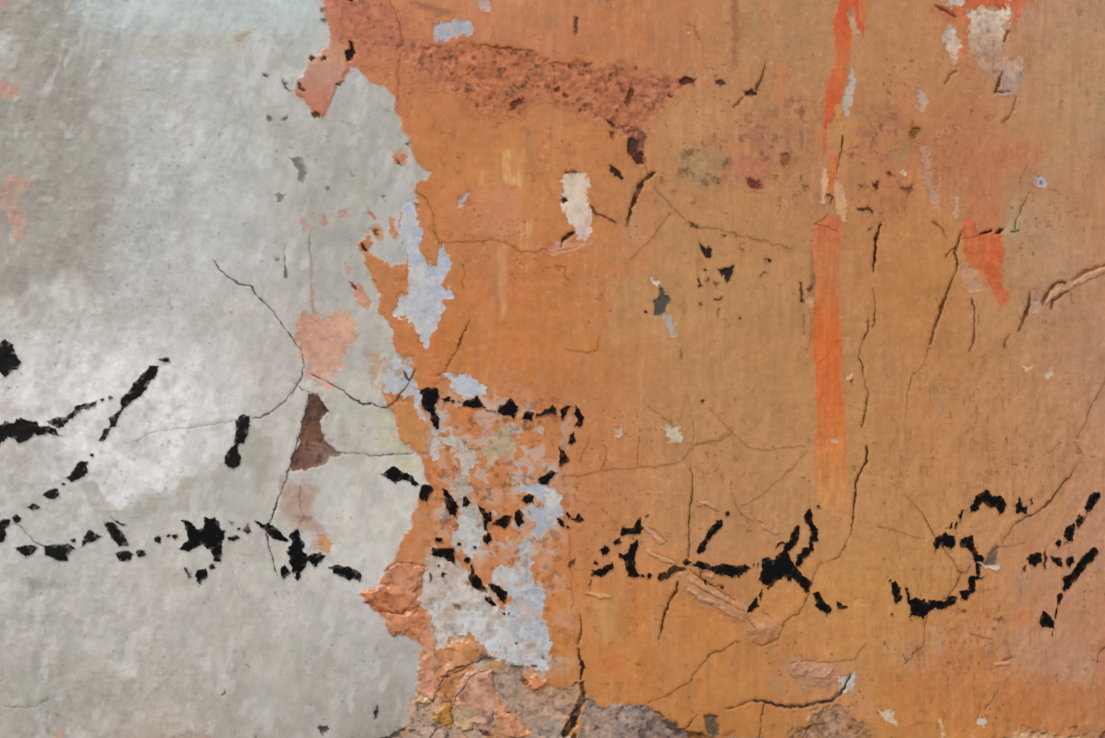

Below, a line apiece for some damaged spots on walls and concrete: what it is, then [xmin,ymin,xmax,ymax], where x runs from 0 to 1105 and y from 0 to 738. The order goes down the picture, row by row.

spalling [294,0,698,168]
peeling [539,169,594,259]
spalling [607,163,625,182]
crack [905,164,1032,416]
peeling [929,0,1040,124]
crack [1002,262,1105,349]
crack [123,260,470,576]
peeling [291,201,899,738]
crack [559,392,808,641]
crack [647,223,972,738]
crack [560,533,587,738]
spalling [970,688,1105,738]